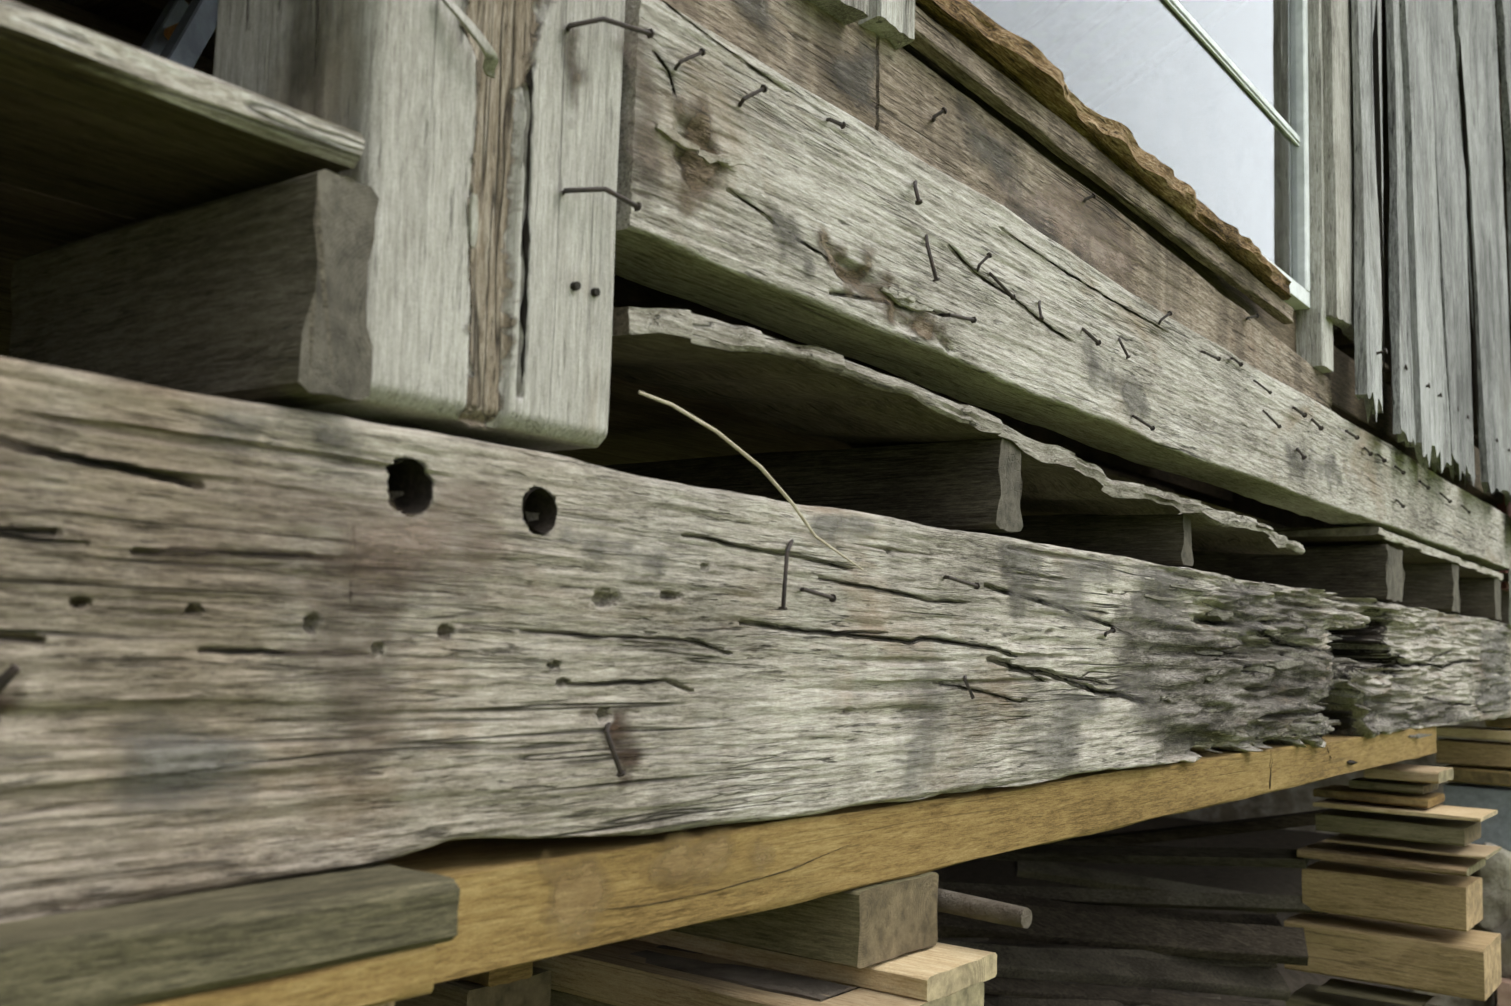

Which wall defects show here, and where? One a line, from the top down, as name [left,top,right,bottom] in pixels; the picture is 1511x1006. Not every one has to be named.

crack [520,58,533,392]
crack [0,438,202,486]
crack [0,527,87,544]
crack [136,532,355,599]
crack [201,649,372,657]
crack [527,631,728,653]
crack [566,680,689,690]
crack [687,535,1159,703]
spalling [1121,582,1337,751]
spalling [1364,696,1471,739]
corrosion [606,713,639,782]